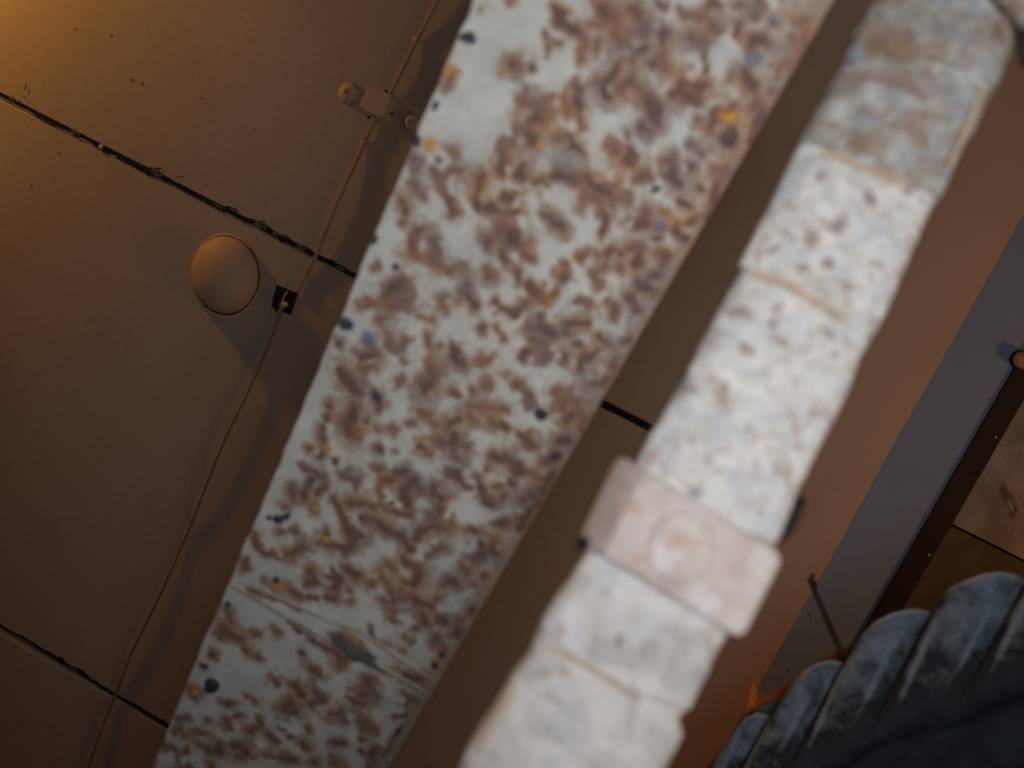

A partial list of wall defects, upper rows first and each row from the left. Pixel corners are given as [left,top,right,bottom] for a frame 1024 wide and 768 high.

crack [0,85,358,278]
corrosion [754,271,855,326]
corrosion [152,0,834,768]
crack [599,402,654,432]
crack [0,624,170,729]